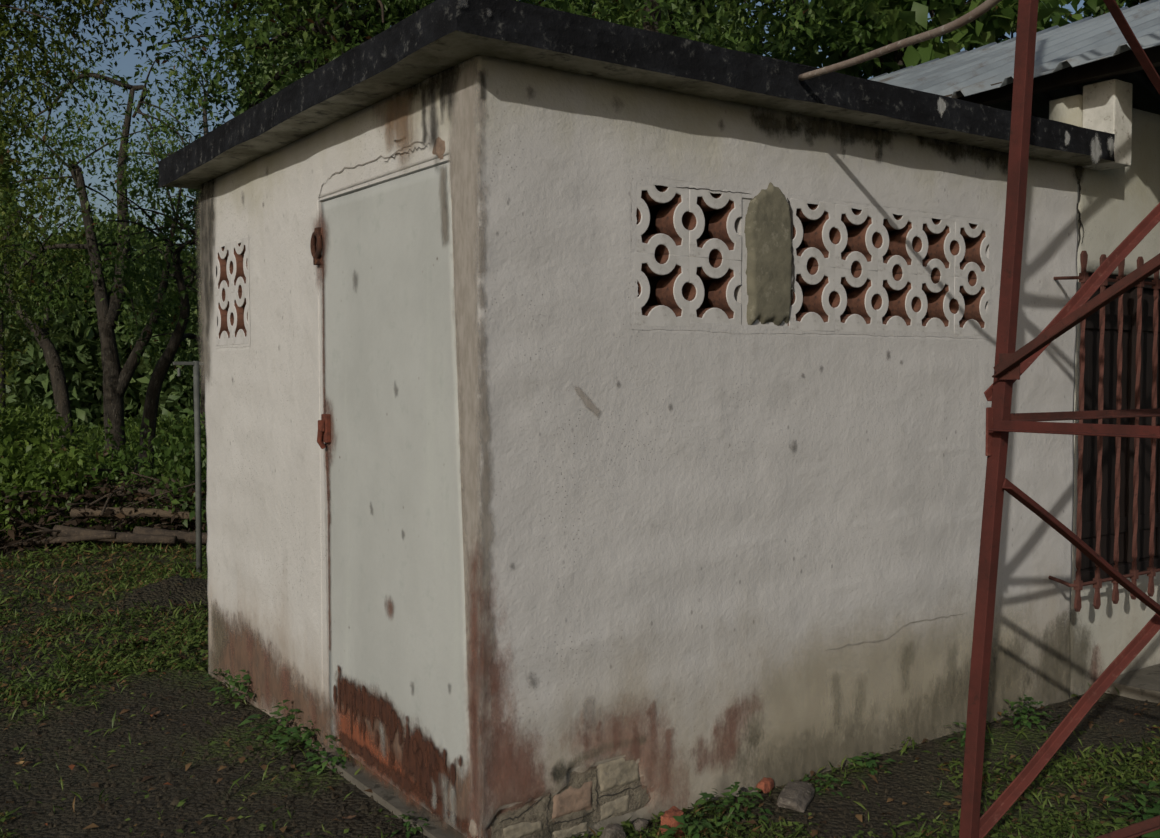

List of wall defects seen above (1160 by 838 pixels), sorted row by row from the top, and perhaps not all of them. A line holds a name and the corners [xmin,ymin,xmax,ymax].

water stain [384,67,459,144]
water stain [752,110,893,160]
water stain [917,136,1009,172]
corrosion [213,559,481,838]
water stain [745,665,970,787]
water stain [986,624,1088,724]
spalling [488,745,651,838]